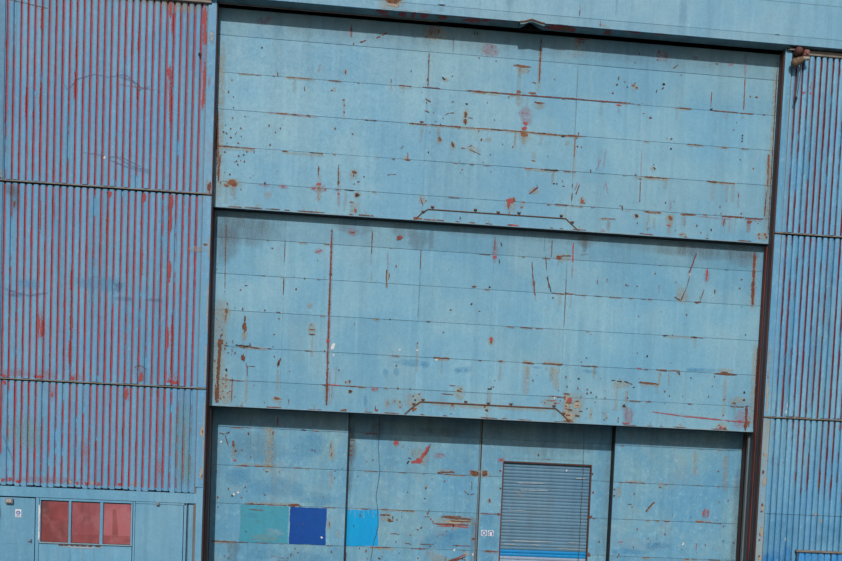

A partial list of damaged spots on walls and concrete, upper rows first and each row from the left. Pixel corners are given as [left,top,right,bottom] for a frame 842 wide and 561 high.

corrosion [544,21,613,40]
corrosion [467,90,640,105]
corrosion [410,121,583,157]
corrosion [308,230,363,410]
corrosion [215,334,271,403]
peeling [541,376,606,421]
peeling [430,515,472,530]